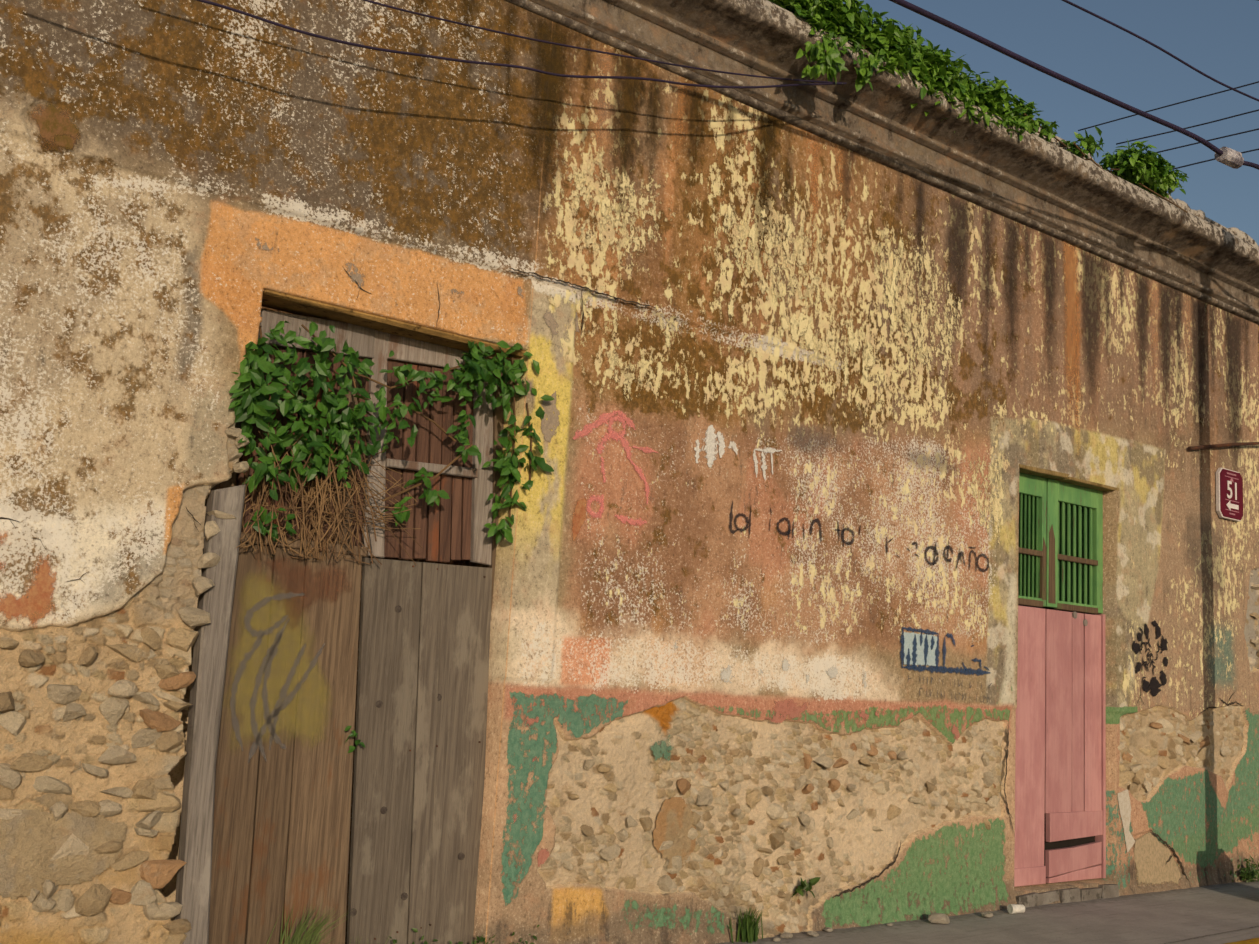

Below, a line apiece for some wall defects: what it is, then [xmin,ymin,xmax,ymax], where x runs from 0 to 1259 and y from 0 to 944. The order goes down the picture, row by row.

peeling [561,142,676,266]
peeling [598,304,698,401]
peeling [722,203,875,410]
peeling [874,230,966,394]
damp [948,197,969,305]
damp [984,213,1056,349]
damp [1081,252,1123,386]
damp [1137,276,1248,451]
spalling [0,484,236,944]
spalling [537,698,1004,942]
crack [832,842,901,898]
spalling [1117,705,1245,885]